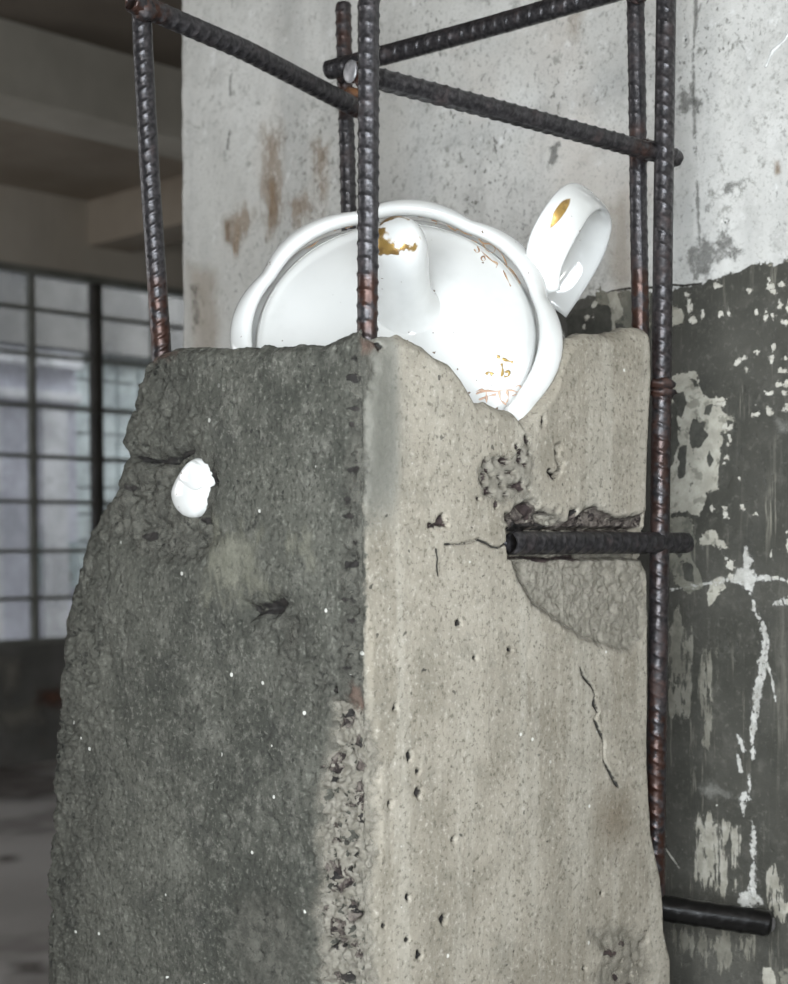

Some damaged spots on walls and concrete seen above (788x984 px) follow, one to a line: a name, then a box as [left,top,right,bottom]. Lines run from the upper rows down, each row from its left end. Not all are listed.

peeling [754,277,788,325]
peeling [733,343,788,418]
spalling [504,0,758,897]
crack [435,539,504,576]
crack [580,669,618,788]
peeling [766,864,788,923]
peeling [671,925,788,984]